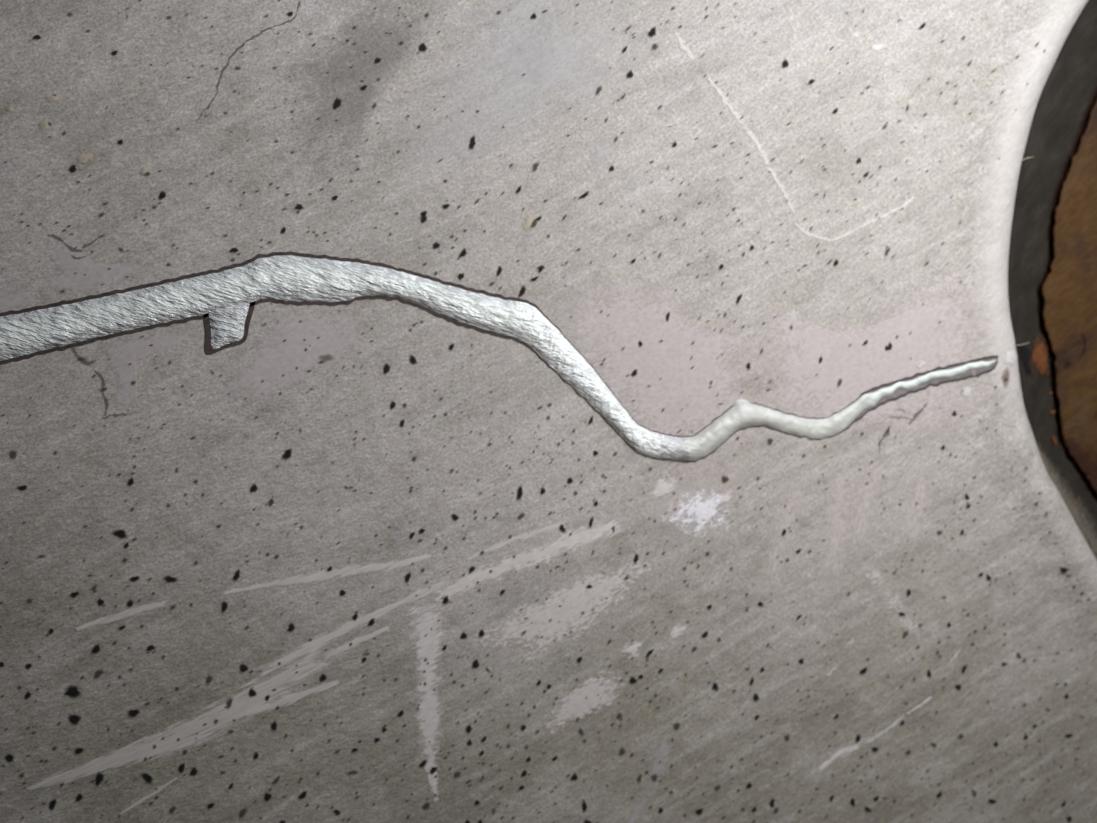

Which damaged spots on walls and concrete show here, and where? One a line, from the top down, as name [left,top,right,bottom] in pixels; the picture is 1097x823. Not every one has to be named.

crack [0,251,998,463]